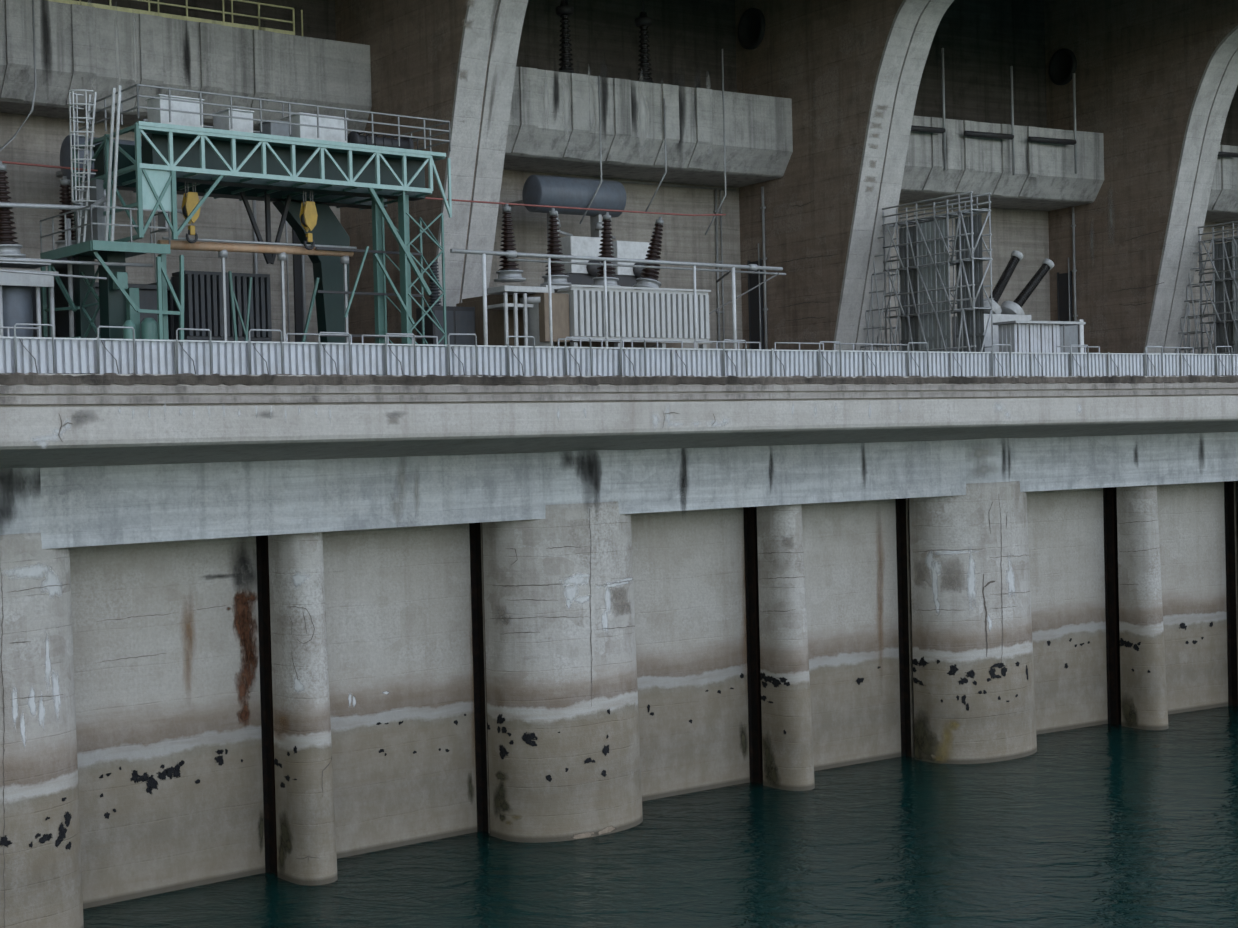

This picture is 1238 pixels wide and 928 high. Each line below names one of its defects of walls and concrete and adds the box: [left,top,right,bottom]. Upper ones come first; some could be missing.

damp [566,456,599,496]
crack [918,502,1030,663]
corrosion [227,592,257,725]
peeling [761,672,790,703]
peeling [913,657,1028,711]
peeling [99,760,185,795]
peeling [214,749,228,766]
damp [494,772,518,823]
peeling [487,714,538,759]
peeling [584,735,609,777]
peeling [29,797,72,850]